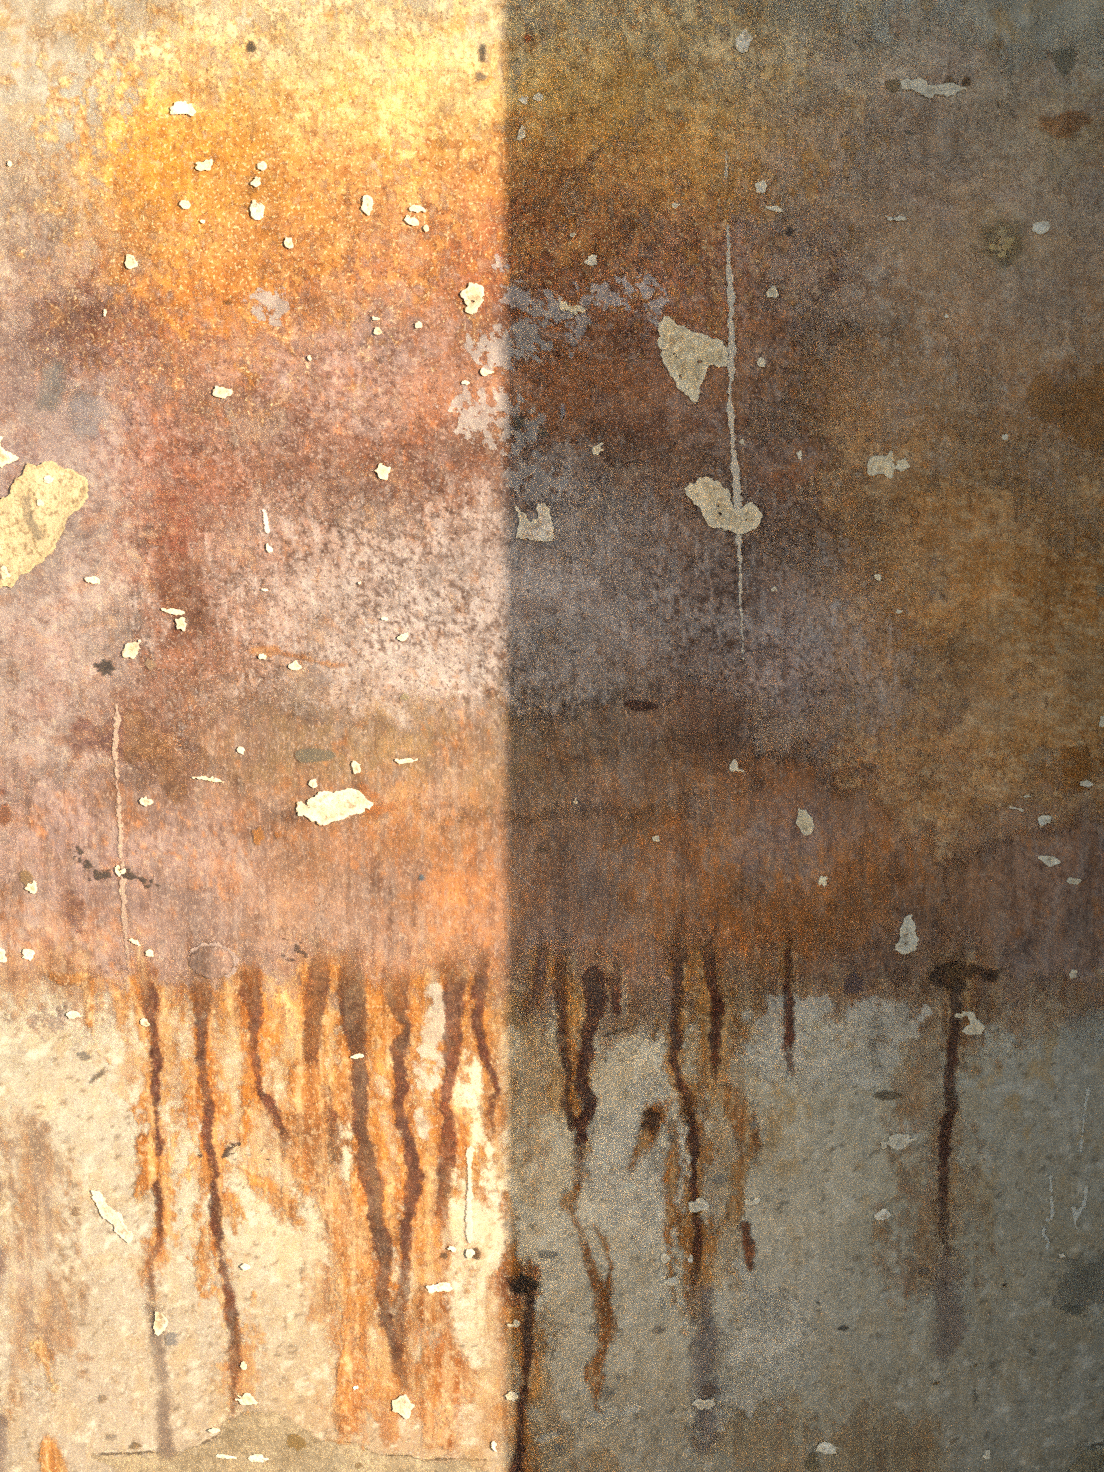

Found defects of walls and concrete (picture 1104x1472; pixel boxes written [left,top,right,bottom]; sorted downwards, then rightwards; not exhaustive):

crack [722,151,730,177]
spalling [460,282,484,314]
spalling [657,316,728,403]
spalling [0,436,89,588]
spalling [684,477,762,535]
crack [726,225,745,660]
spalling [296,761,394,825]
corrosion [628,1097,672,1169]
corrosion [283,1060,374,1435]
corrosion [412,1288,477,1451]
corrosion [489,1191,545,1472]
corrosion [560,1184,617,1413]